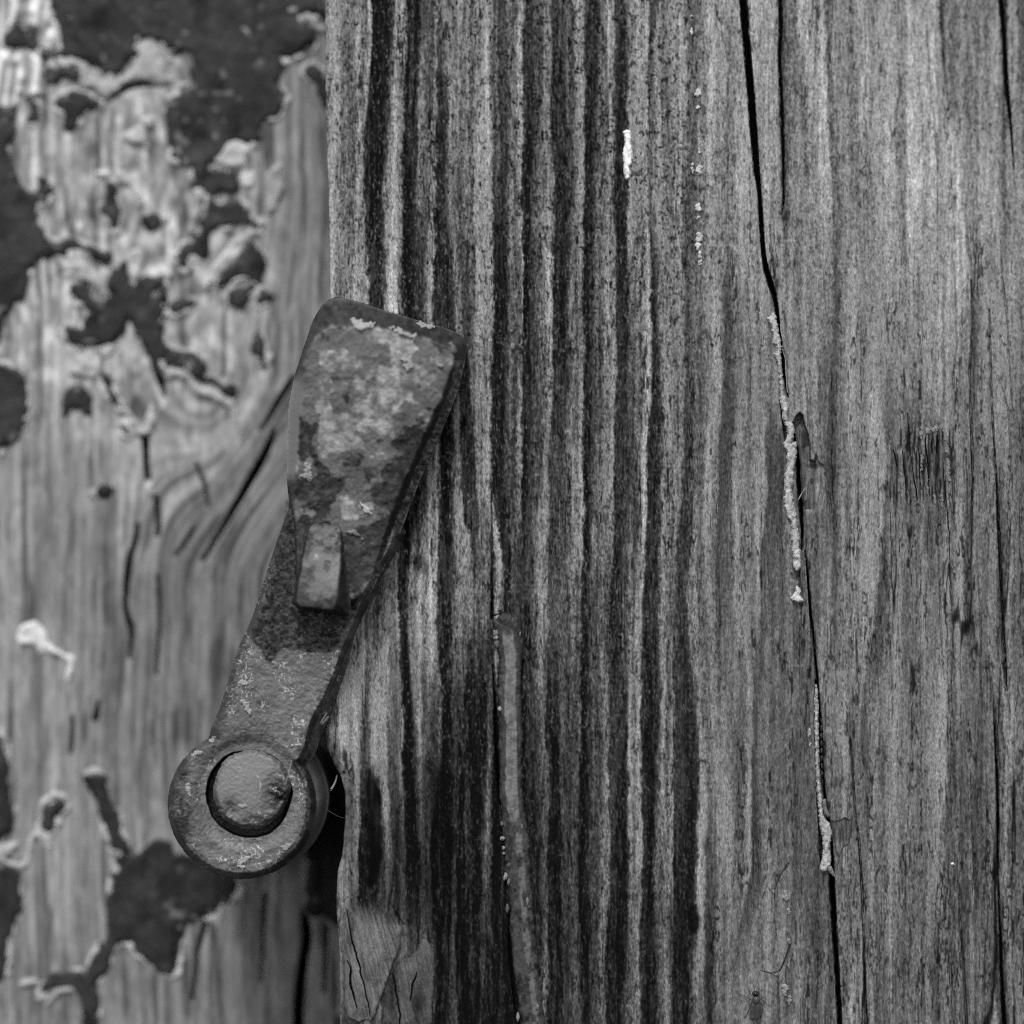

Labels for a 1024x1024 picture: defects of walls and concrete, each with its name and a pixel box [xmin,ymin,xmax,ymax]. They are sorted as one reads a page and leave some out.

crack [998,0,1014,170]
peeling [0,0,326,457]
peeling [17,621,76,681]
peeling [89,483,115,500]
peeling [238,678,252,715]
corrosion [252,502,357,662]
peeling [300,462,313,482]
crack [740,0,877,1024]
peeling [0,727,251,1024]
peeling [304,768,346,927]